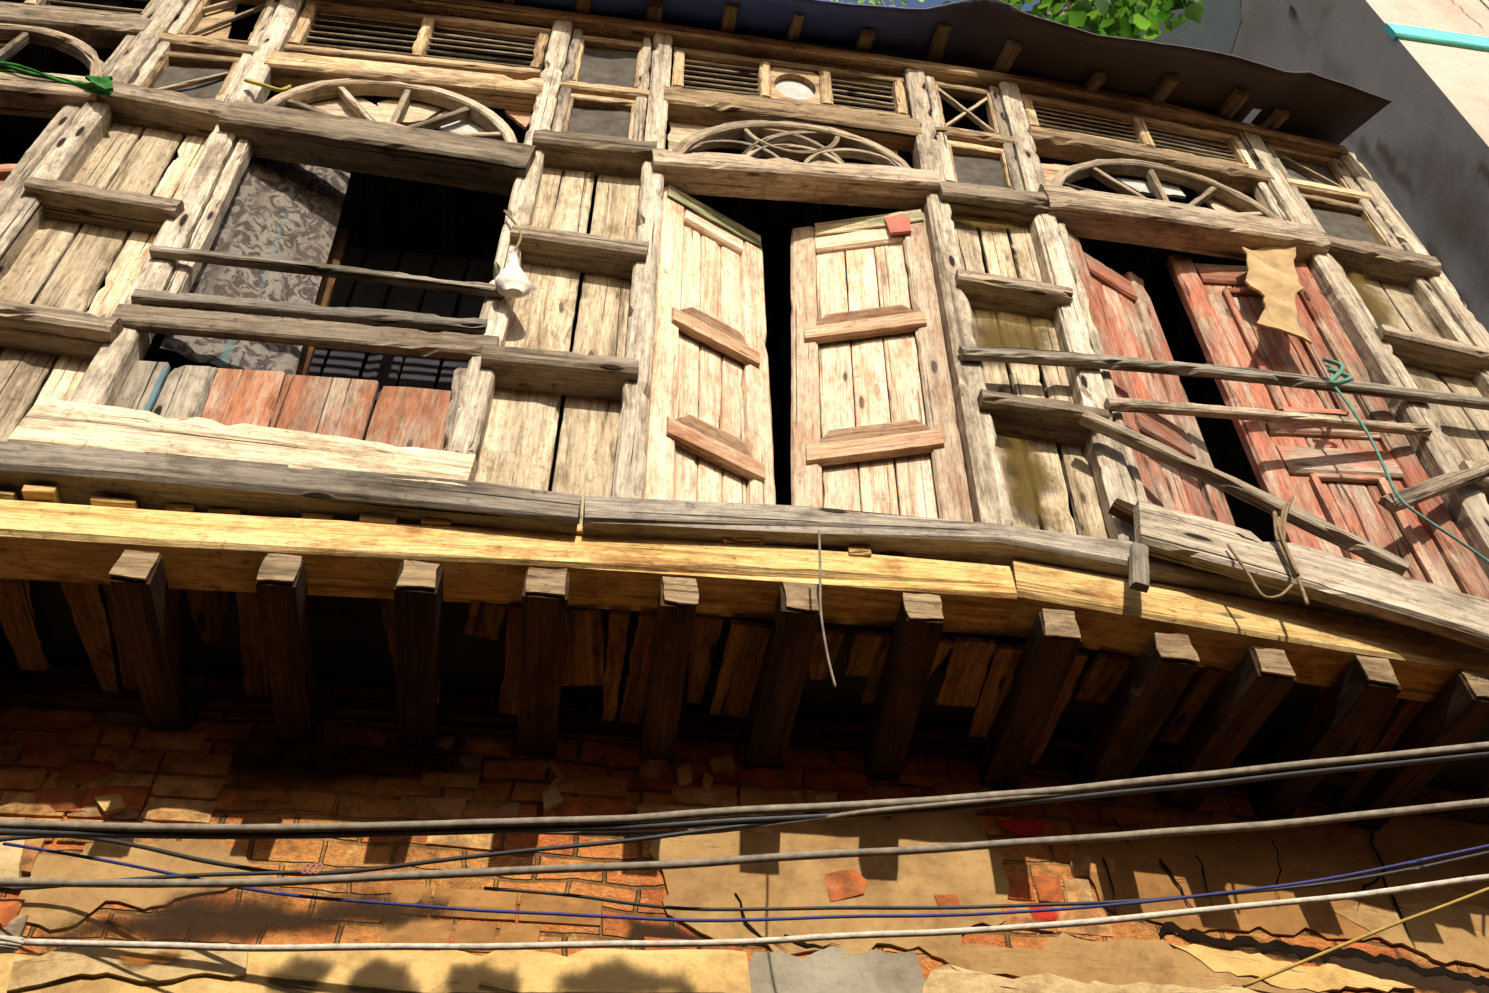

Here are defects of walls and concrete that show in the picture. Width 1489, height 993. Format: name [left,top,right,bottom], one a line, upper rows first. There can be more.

flaking render [0,708,248,993]
spalling [825,869,867,902]
spalling [934,894,960,906]
crack [1102,817,1213,917]
crack [1271,838,1282,909]
crack [1357,829,1417,950]